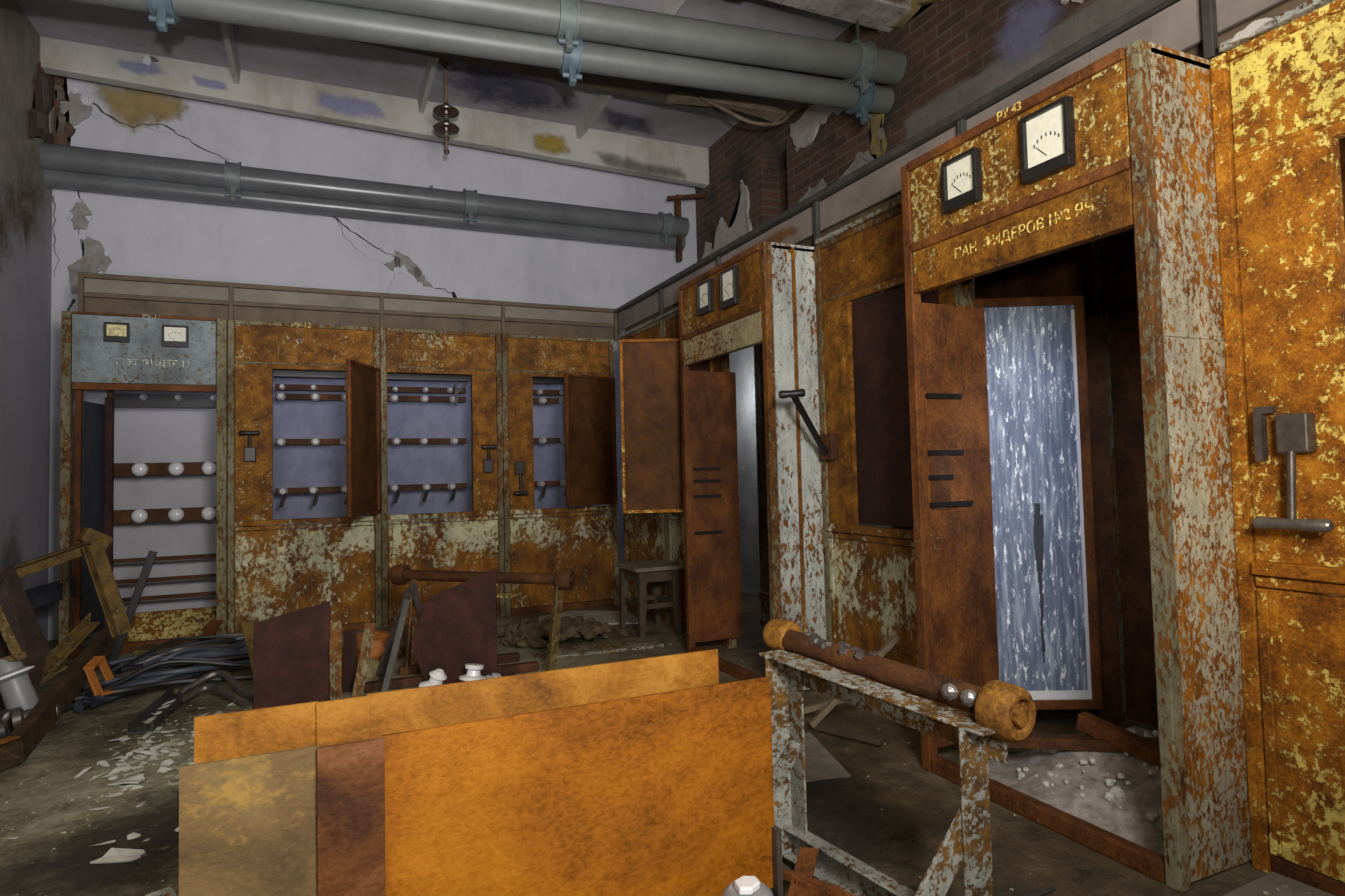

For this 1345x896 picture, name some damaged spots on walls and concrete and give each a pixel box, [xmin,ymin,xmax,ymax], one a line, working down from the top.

spalling [26,62,93,146]
water stain [99,86,181,125]
crack [93,102,230,160]
peeling [790,104,846,152]
peeling [799,112,887,202]
peeling [65,198,113,294]
crack [333,216,395,293]
spalling [384,248,434,288]
peeling [702,180,752,259]